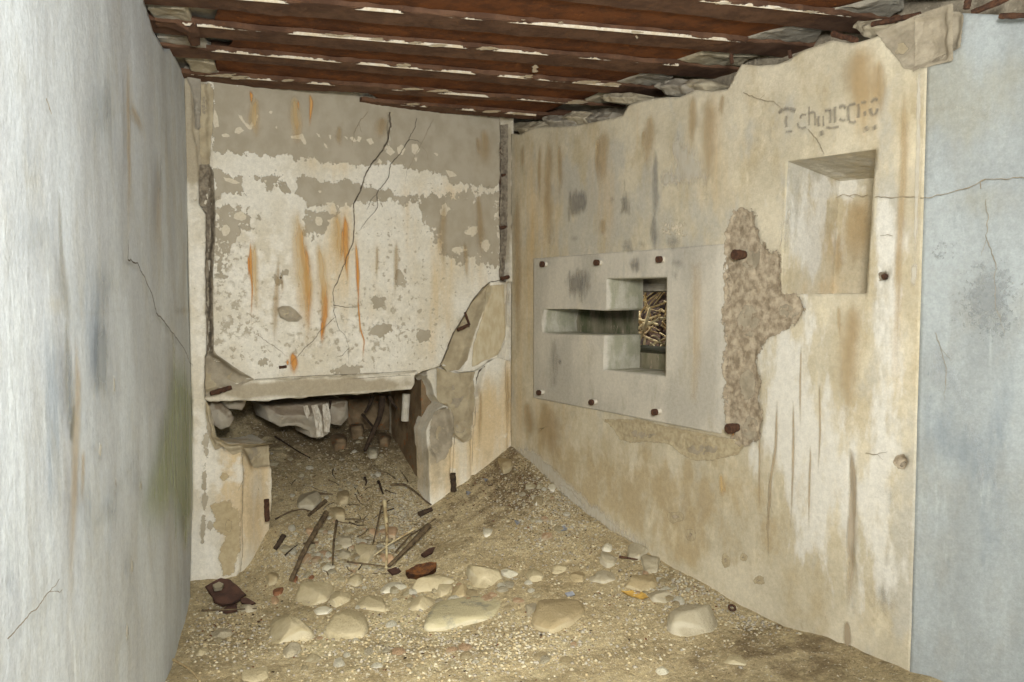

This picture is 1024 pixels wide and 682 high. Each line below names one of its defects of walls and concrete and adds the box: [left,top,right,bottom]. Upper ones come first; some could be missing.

peeling [677,51,758,67]
spalling [834,0,964,71]
crack [128,240,192,364]
corrosion [300,232,327,337]
peeling [157,33,508,576]
crack [247,112,434,380]
corrosion [341,219,364,350]
flaking render [605,207,806,461]
crack [836,177,1024,336]
damp [792,356,801,489]
damp [809,390,821,503]
damp [848,456,856,581]